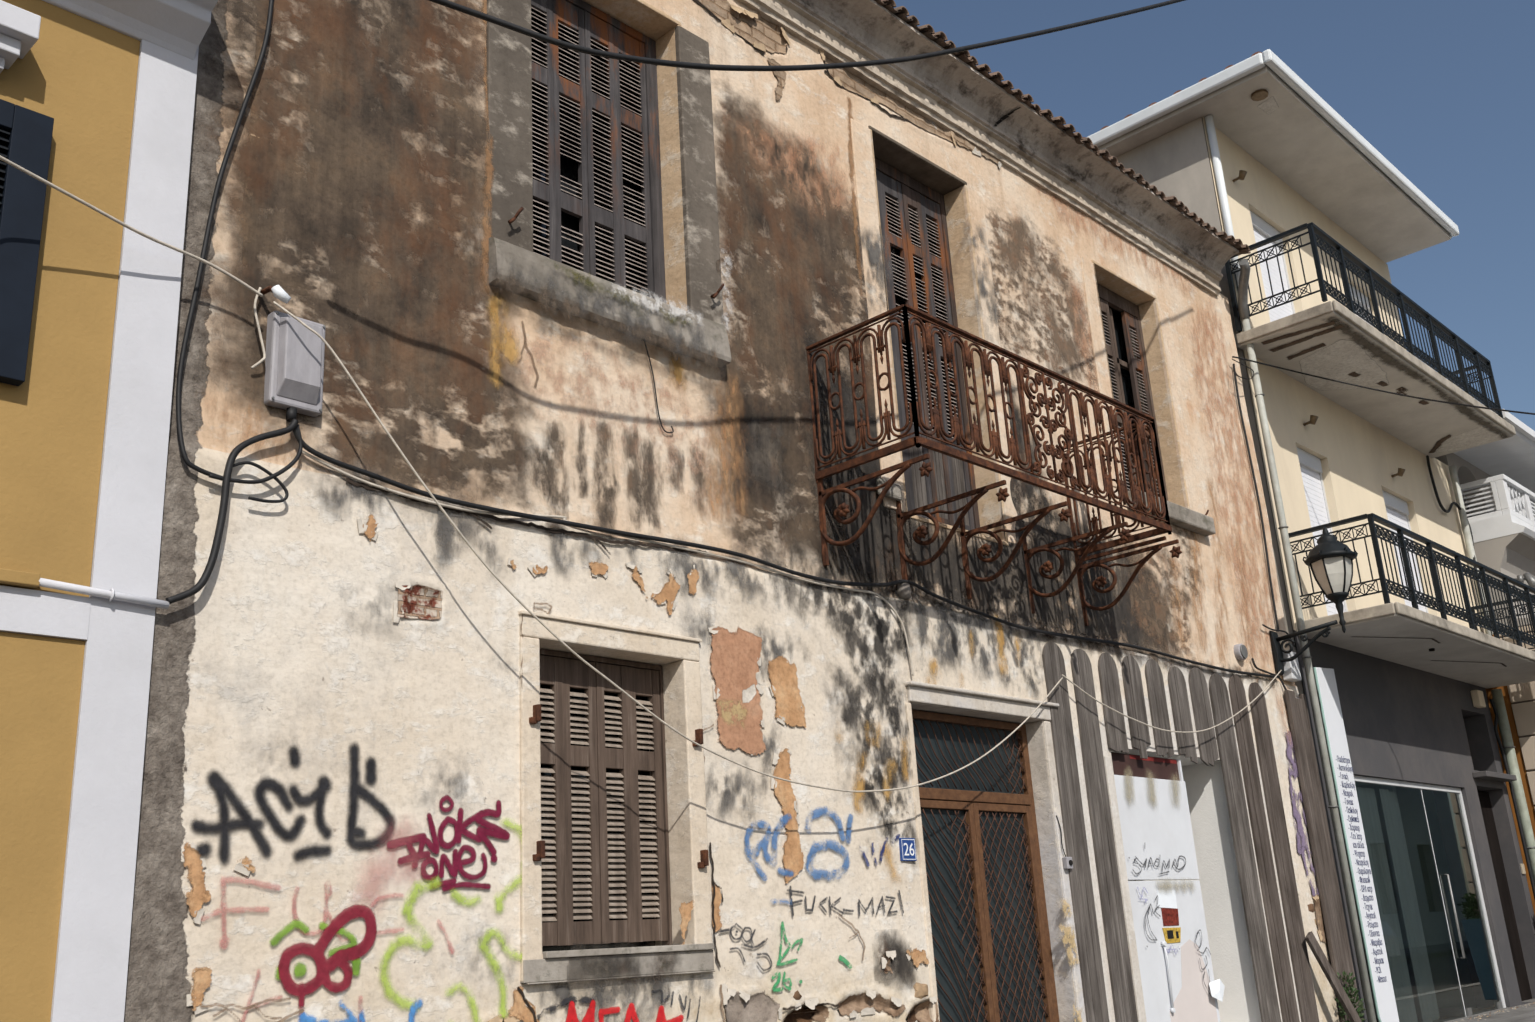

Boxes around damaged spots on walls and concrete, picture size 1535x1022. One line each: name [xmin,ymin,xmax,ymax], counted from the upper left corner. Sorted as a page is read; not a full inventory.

flaking render [698,0,791,100]
water stain [207,0,1277,686]
flaking render [393,581,443,623]
peeling [507,558,548,577]
peeling [589,562,608,579]
peeling [626,560,699,615]
peeling [708,626,806,884]
peeling [182,842,211,924]
peeling [186,967,212,1015]
peeling [487,986,540,1022]
flaking render [721,948,940,1022]